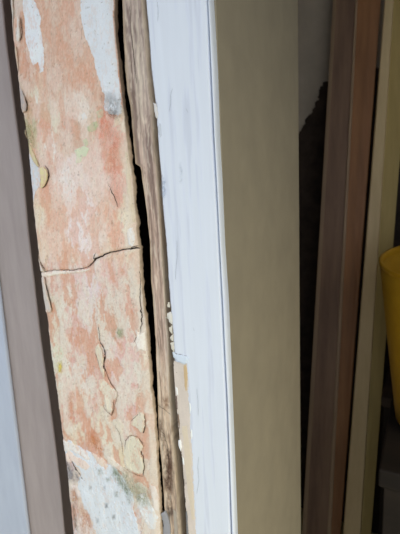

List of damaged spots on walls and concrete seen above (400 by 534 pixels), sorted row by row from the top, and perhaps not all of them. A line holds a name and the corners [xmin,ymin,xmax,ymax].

peeling [11,0,44,113]
peeling [80,0,122,132]
peeling [25,130,48,204]
spalling [125,151,136,246]
peeling [39,257,90,313]
crack [39,0,170,521]
peeling [95,344,117,413]
spalling [130,331,149,367]
peeling [63,412,178,534]
peeling [173,361,196,534]